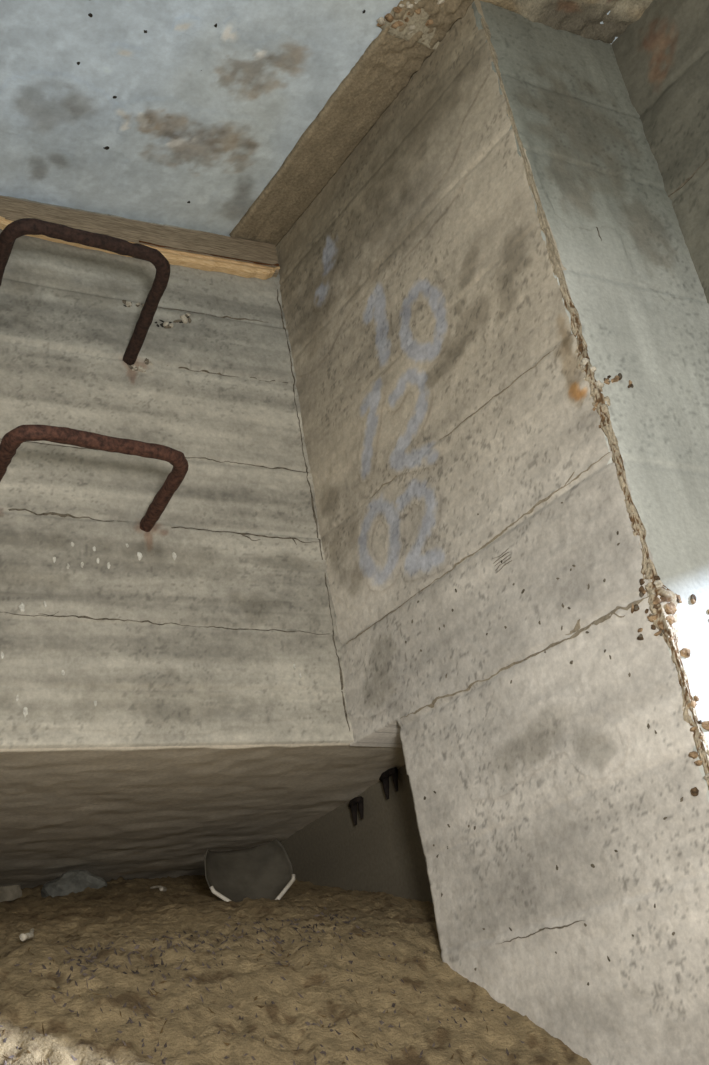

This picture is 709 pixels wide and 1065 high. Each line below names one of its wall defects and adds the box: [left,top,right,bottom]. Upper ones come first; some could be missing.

spalling [377,0,449,50]
spalling [474,0,653,44]
damp [0,31,320,237]
corrosion [116,350,158,386]
spalling [481,17,709,802]
corrosion [129,516,172,557]
crack [500,920,583,944]